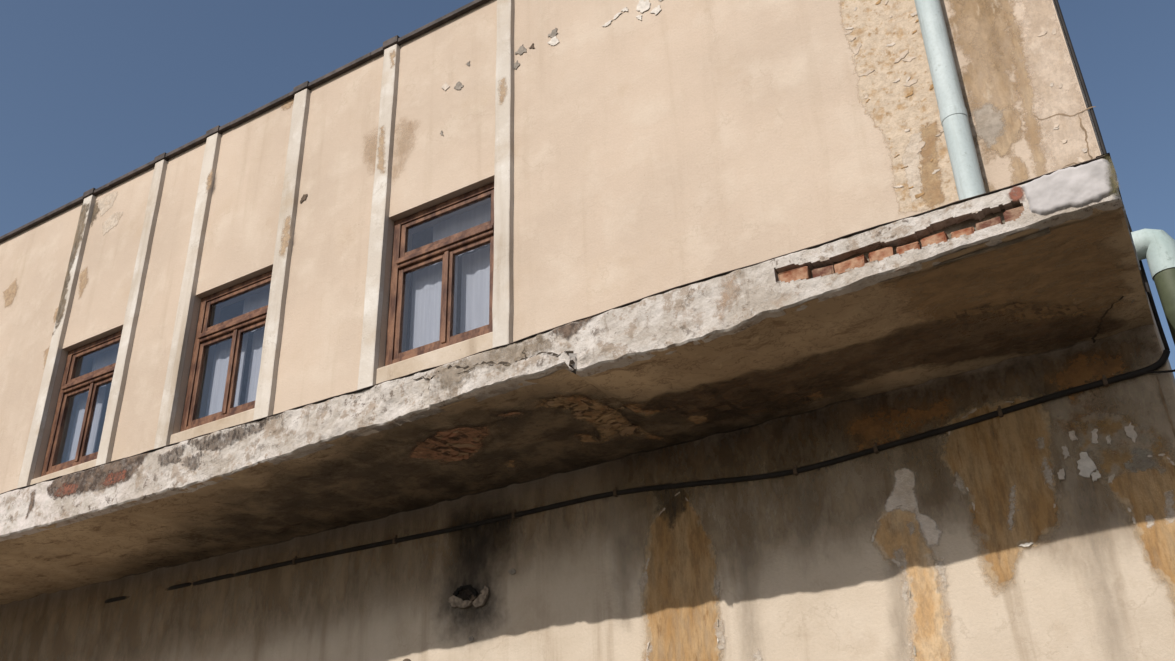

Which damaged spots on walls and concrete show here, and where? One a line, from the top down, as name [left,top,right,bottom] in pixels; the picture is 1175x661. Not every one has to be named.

peeling [602,0,662,27]
peeling [840,0,959,213]
peeling [3,281,17,307]
spalling [778,186,1024,283]
spalling [933,228,1050,267]
spalling [47,453,147,500]
water stain [0,200,1167,661]
peeling [939,397,1175,603]
spalling [447,584,490,608]
peeling [872,468,951,661]